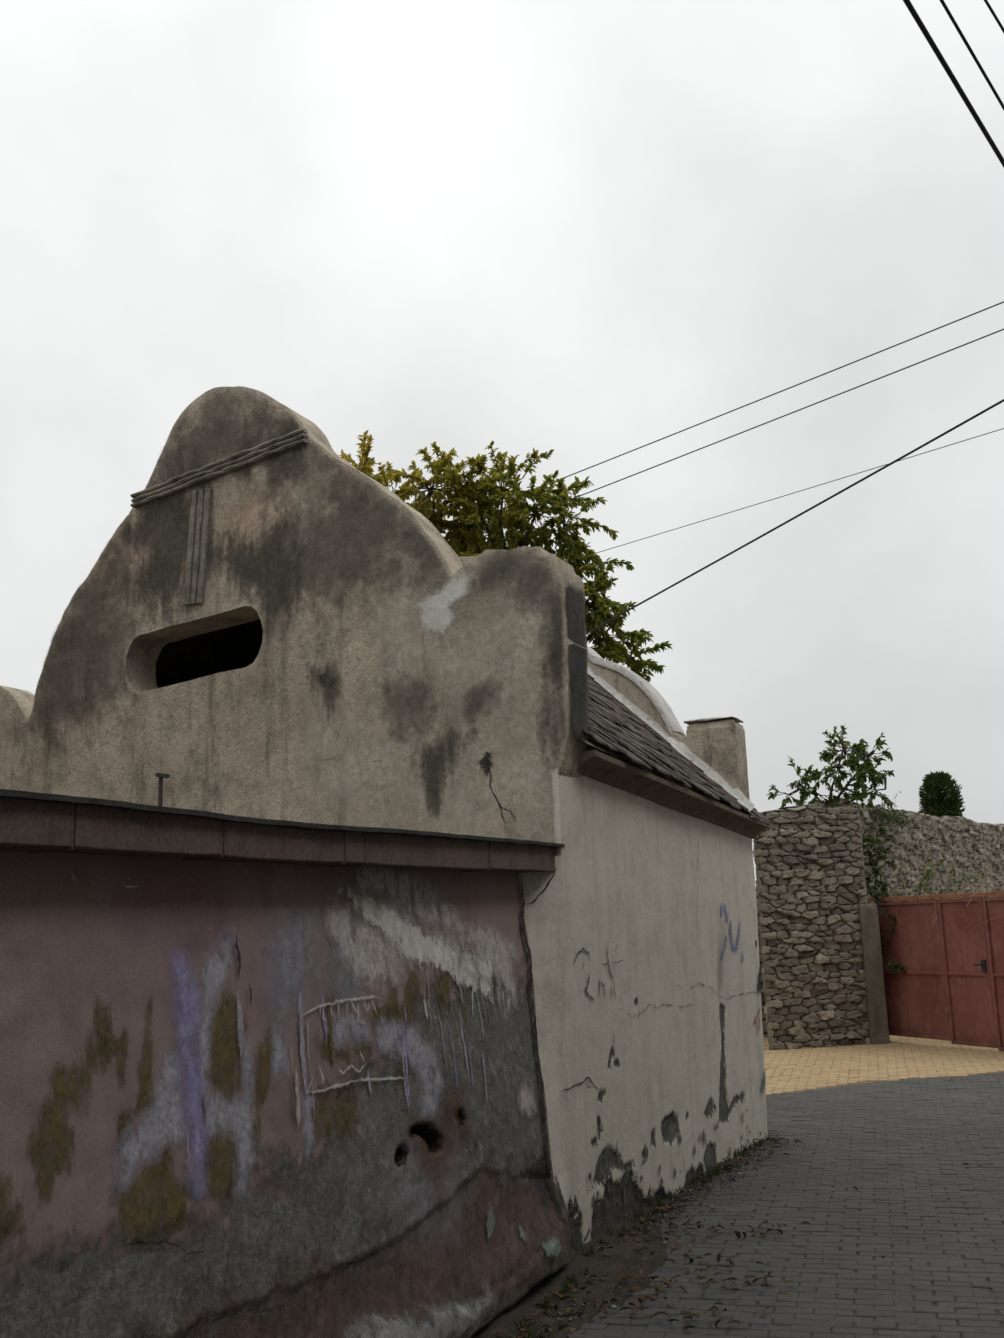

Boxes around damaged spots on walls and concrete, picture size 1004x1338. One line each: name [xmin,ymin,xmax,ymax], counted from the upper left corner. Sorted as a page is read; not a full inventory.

water stain [34,398,443,741]
water stain [482,553,589,744]
water stain [422,735,455,814]
water stain [479,751,493,775]
crack [486,755,515,830]
spalling [0,954,751,1338]
crack [519,868,599,1250]
crack [119,1238,209,1255]